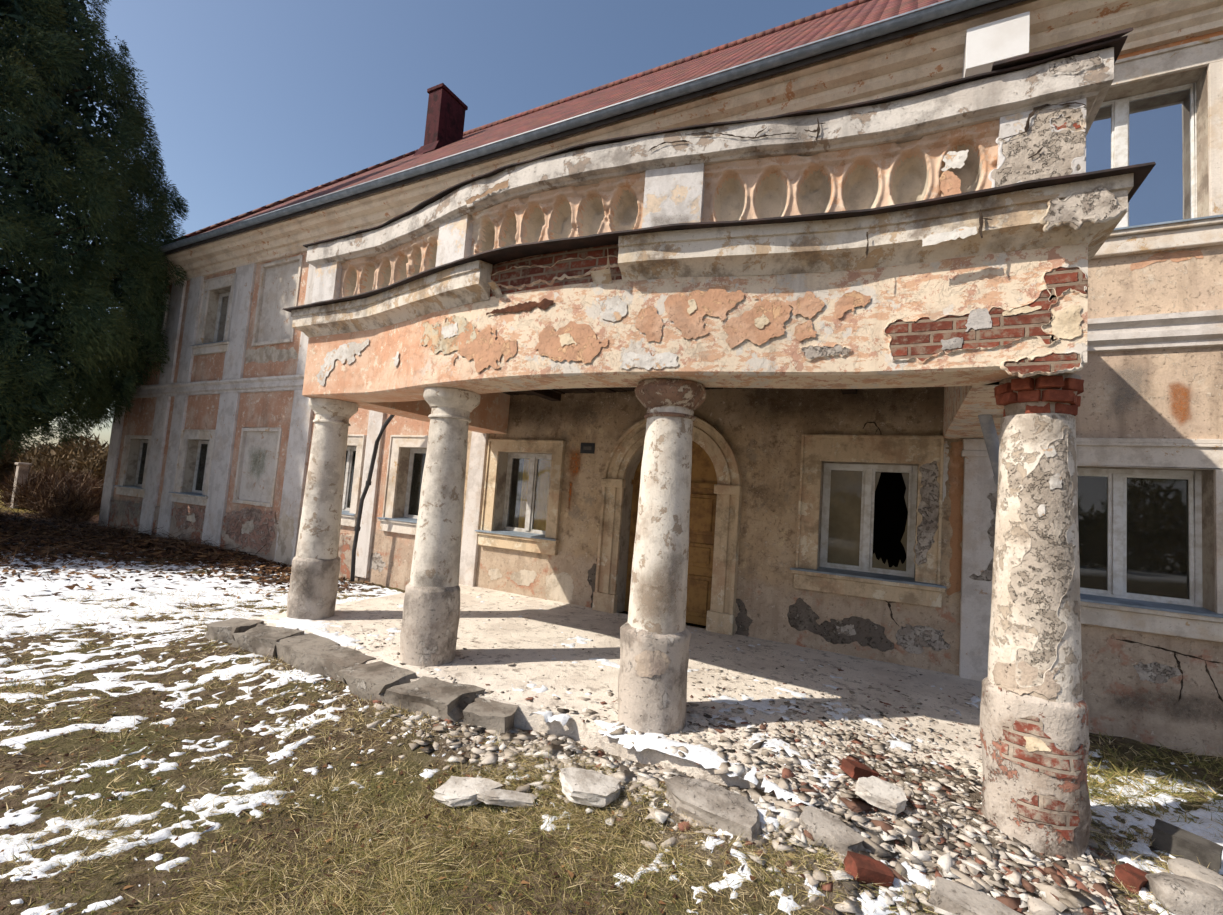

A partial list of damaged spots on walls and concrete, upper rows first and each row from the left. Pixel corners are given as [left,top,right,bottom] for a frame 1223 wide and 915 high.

crack [650,118,825,150]
spalling [988,102,1087,188]
spalling [1040,186,1127,232]
peeling [316,338,369,386]
peeling [420,315,517,373]
peeling [535,286,871,364]
flaking render [883,266,1088,378]
flaking render [913,427,1076,699]
spalling [787,597,952,655]
crack [1112,638,1223,702]
flaking render [1001,716,1084,779]
flaking render [1012,795,1080,841]